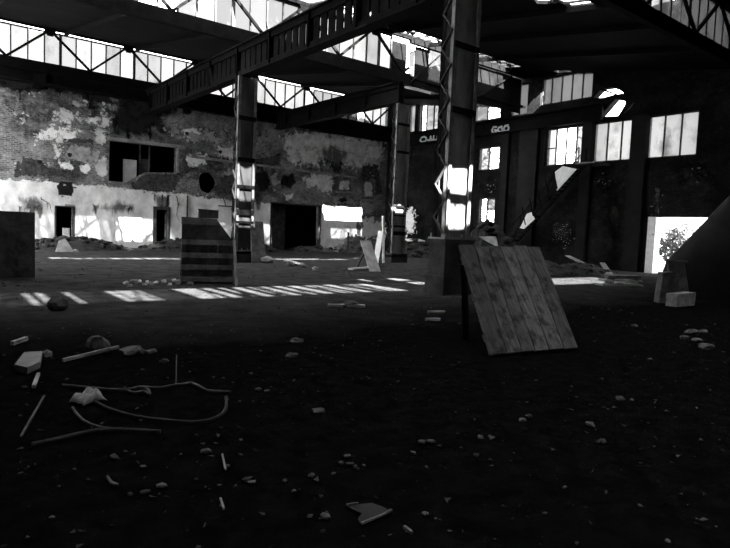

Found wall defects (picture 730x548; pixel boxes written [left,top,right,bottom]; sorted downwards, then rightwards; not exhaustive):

peeling [0,100,233,248]
flaking render [254,128,387,249]